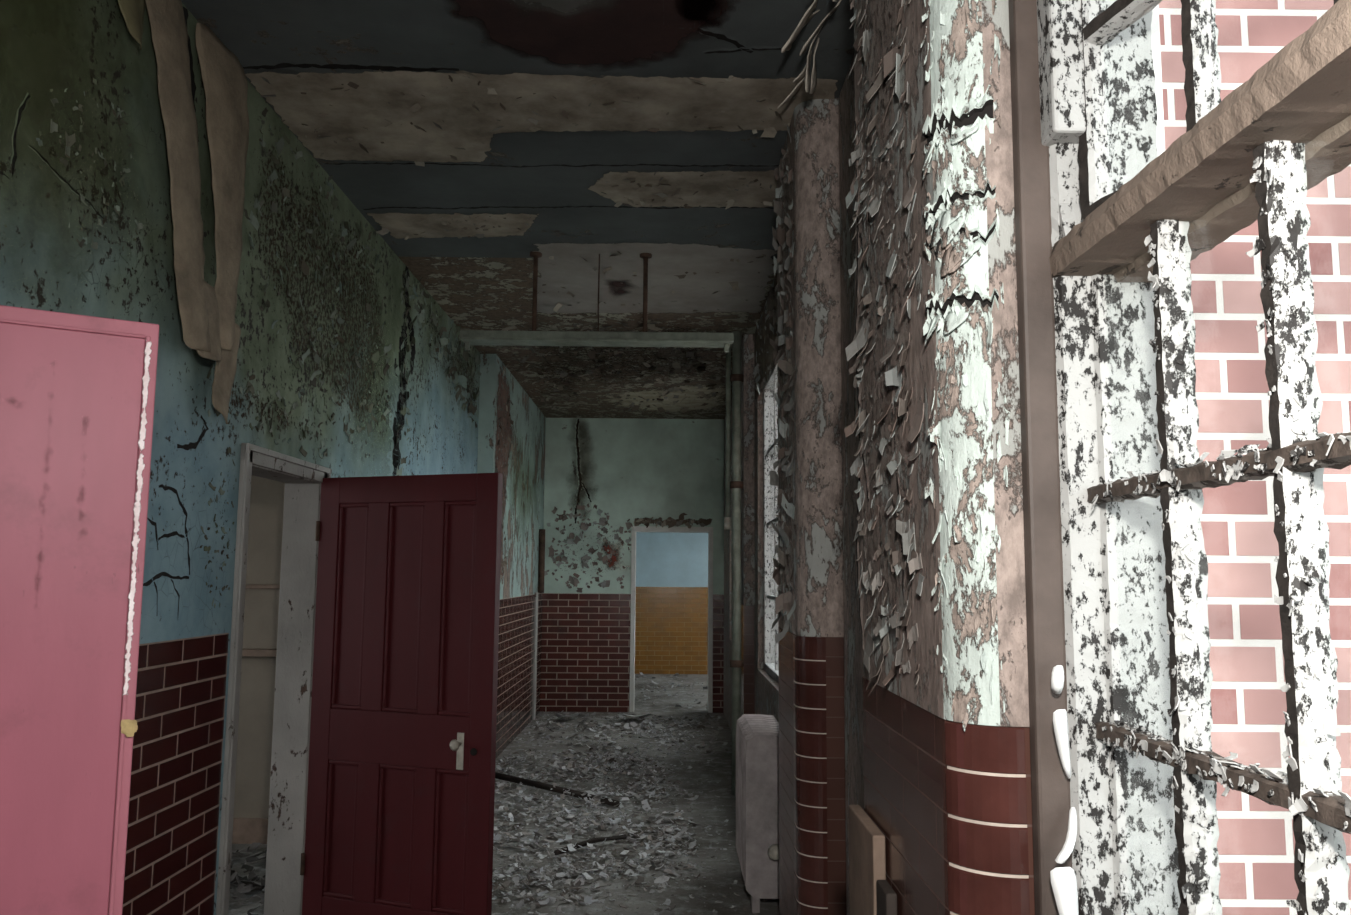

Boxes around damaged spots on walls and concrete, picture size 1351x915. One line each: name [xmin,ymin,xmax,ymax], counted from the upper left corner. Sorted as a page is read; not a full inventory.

water stain [0,0,120,198]
water stain [450,0,733,68]
crack [177,414,210,455]
crack [385,261,419,476]
peeling [118,0,1012,732]
crack [922,84,999,347]
peeling [1144,235,1190,395]
peeling [1091,373,1351,530]
peeling [1250,156,1282,215]
peeling [1246,232,1300,290]
crack [141,482,191,621]
peeling [1102,542,1351,915]